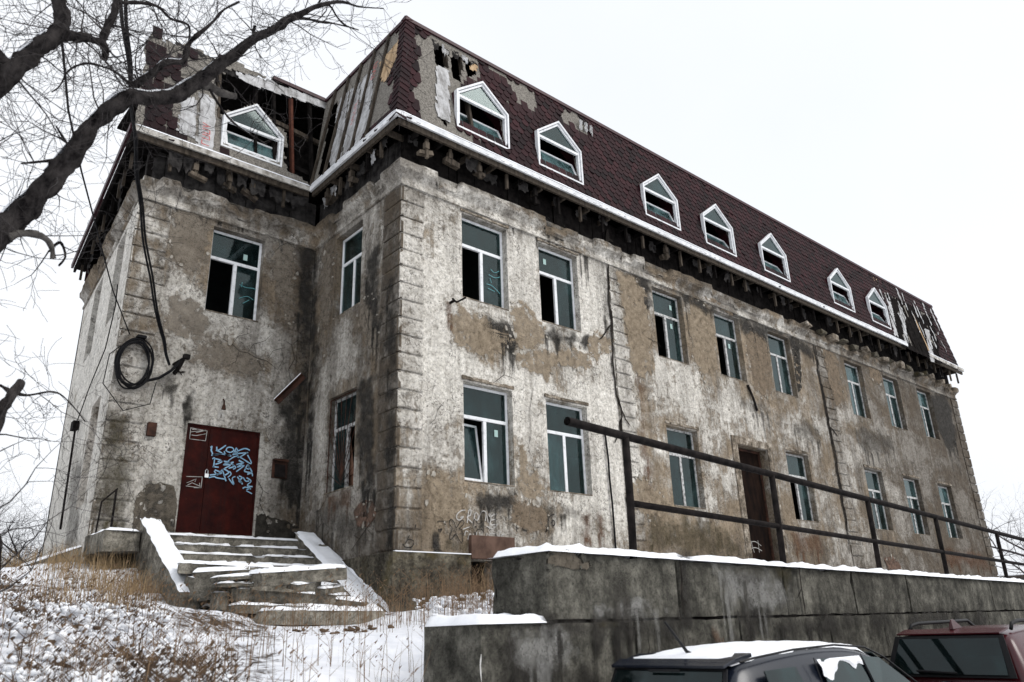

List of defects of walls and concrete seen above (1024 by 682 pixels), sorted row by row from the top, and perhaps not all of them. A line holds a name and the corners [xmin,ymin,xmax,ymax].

leakage [487,317,516,370]
peeling [448,270,655,383]
spalling [132,481,177,531]